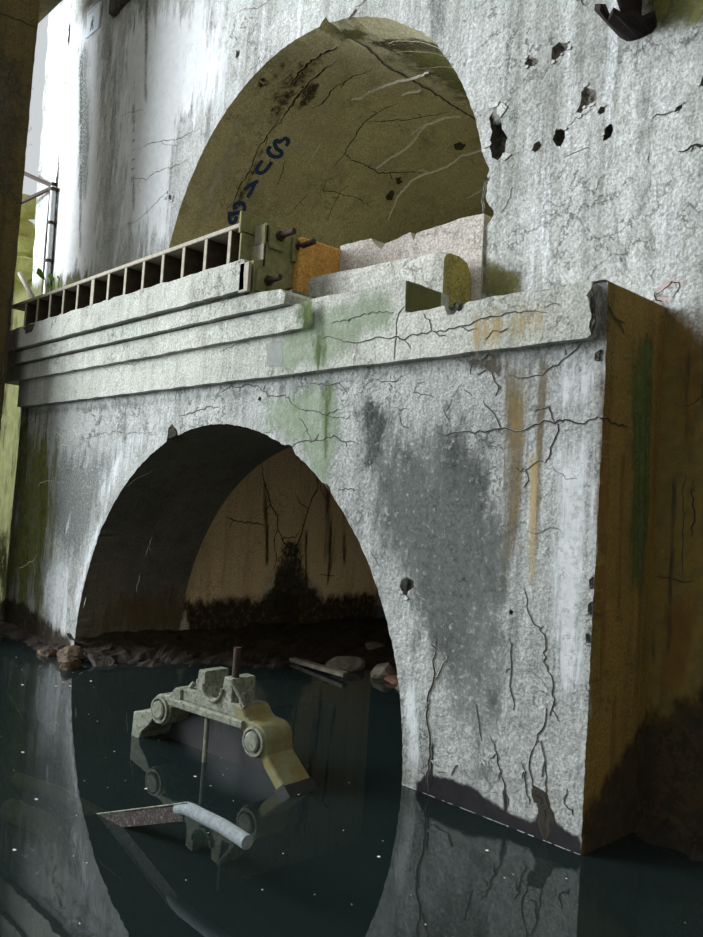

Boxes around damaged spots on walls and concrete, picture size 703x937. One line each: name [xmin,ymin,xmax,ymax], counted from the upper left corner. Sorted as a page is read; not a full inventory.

crack [226,32,482,221]
spalling [484,100,512,161]
spalling [553,127,568,146]
spalling [551,41,572,65]
spalling [576,82,607,119]
spalling [601,122,617,141]
leakage [0,0,229,646]
crack [320,303,628,487]
leakage [364,366,546,718]
leakage [405,281,703,856]
crack [425,639,449,791]
crack [473,587,575,842]